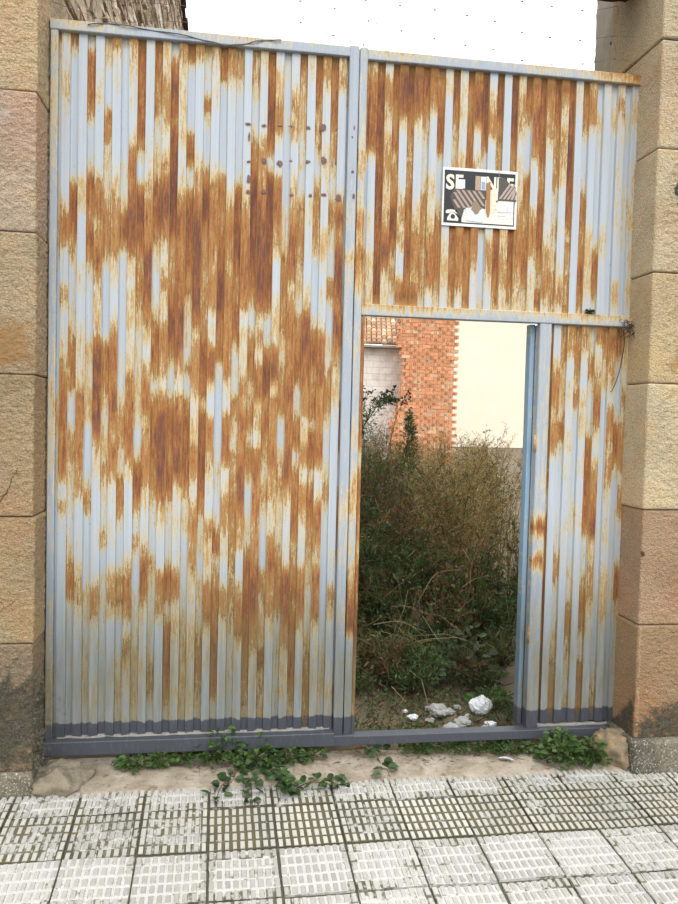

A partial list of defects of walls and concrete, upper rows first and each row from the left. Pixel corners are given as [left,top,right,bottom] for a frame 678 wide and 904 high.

rust [369,68,598,307]
rust [58,48,347,722]
rust [546,333,626,538]
rust [538,520,558,714]
rust [564,561,594,651]
rust [575,660,594,713]